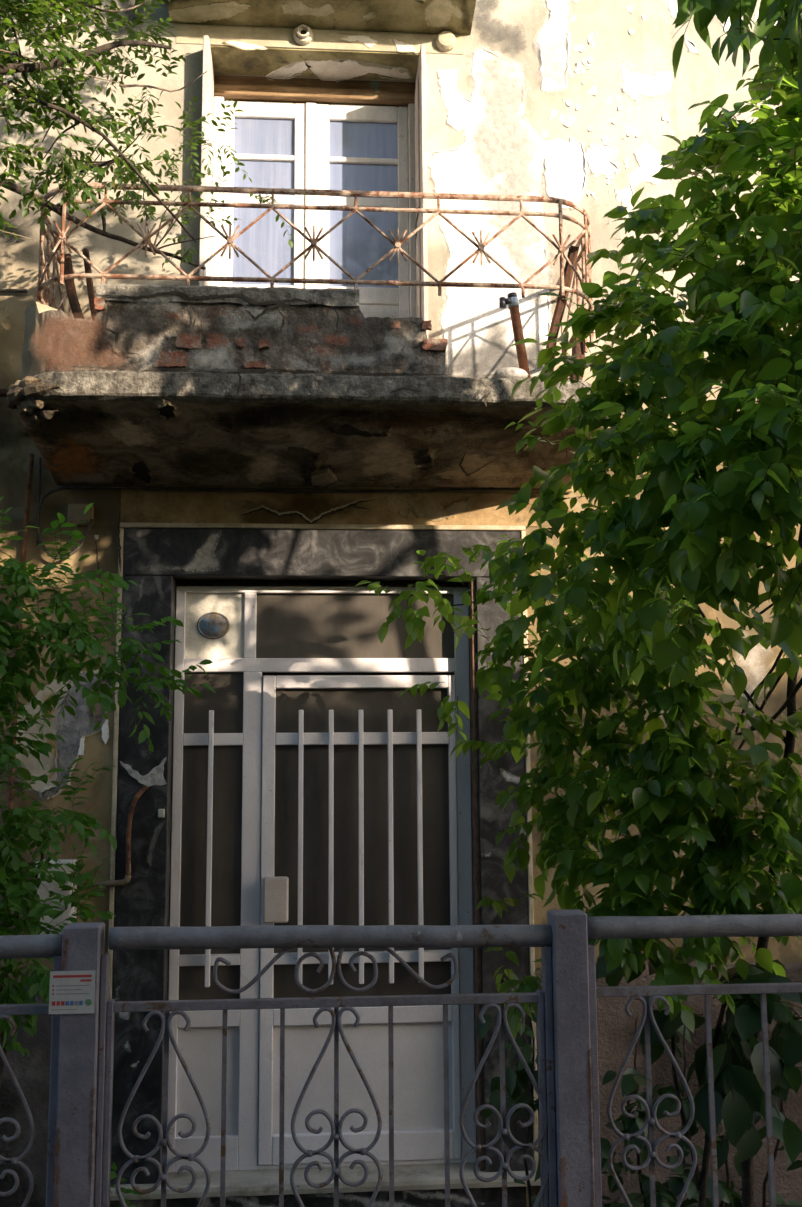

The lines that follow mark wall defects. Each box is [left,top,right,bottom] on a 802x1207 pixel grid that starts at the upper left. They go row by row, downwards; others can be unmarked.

peeling [168,1,251,23]
peeling [414,0,462,28]
peeling [662,0,678,19]
peeling [222,40,267,50]
peeling [266,11,418,82]
damp [463,0,569,302]
peeling [422,0,674,378]
damp [446,324,543,378]
damp [23,409,156,450]
damp [214,406,519,485]
crack [240,497,376,524]
flaking render [15,670,112,800]